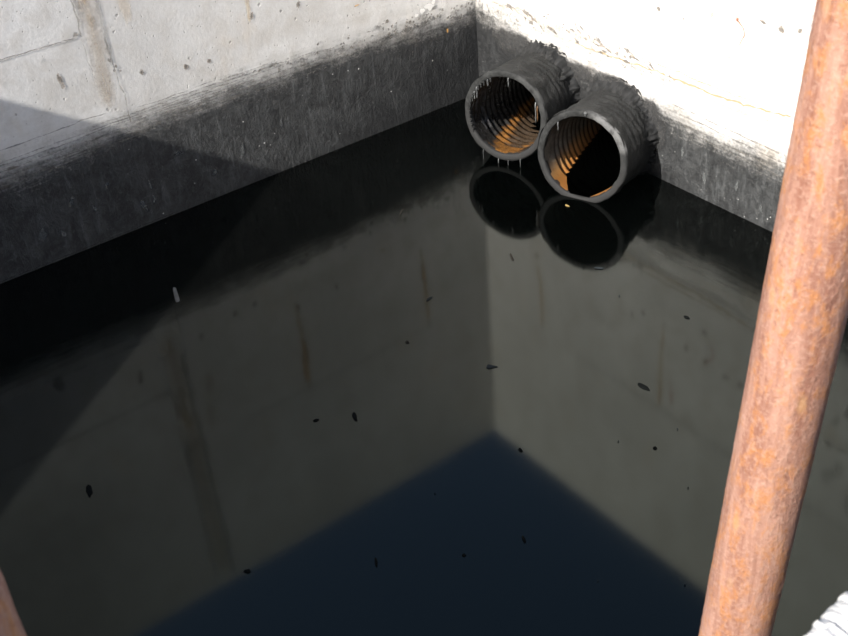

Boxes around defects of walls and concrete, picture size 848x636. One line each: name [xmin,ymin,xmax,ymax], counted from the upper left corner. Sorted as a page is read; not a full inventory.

crack [104,38,131,121]
damp [0,2,630,284]
damp [570,40,791,117]
damp [640,97,785,232]